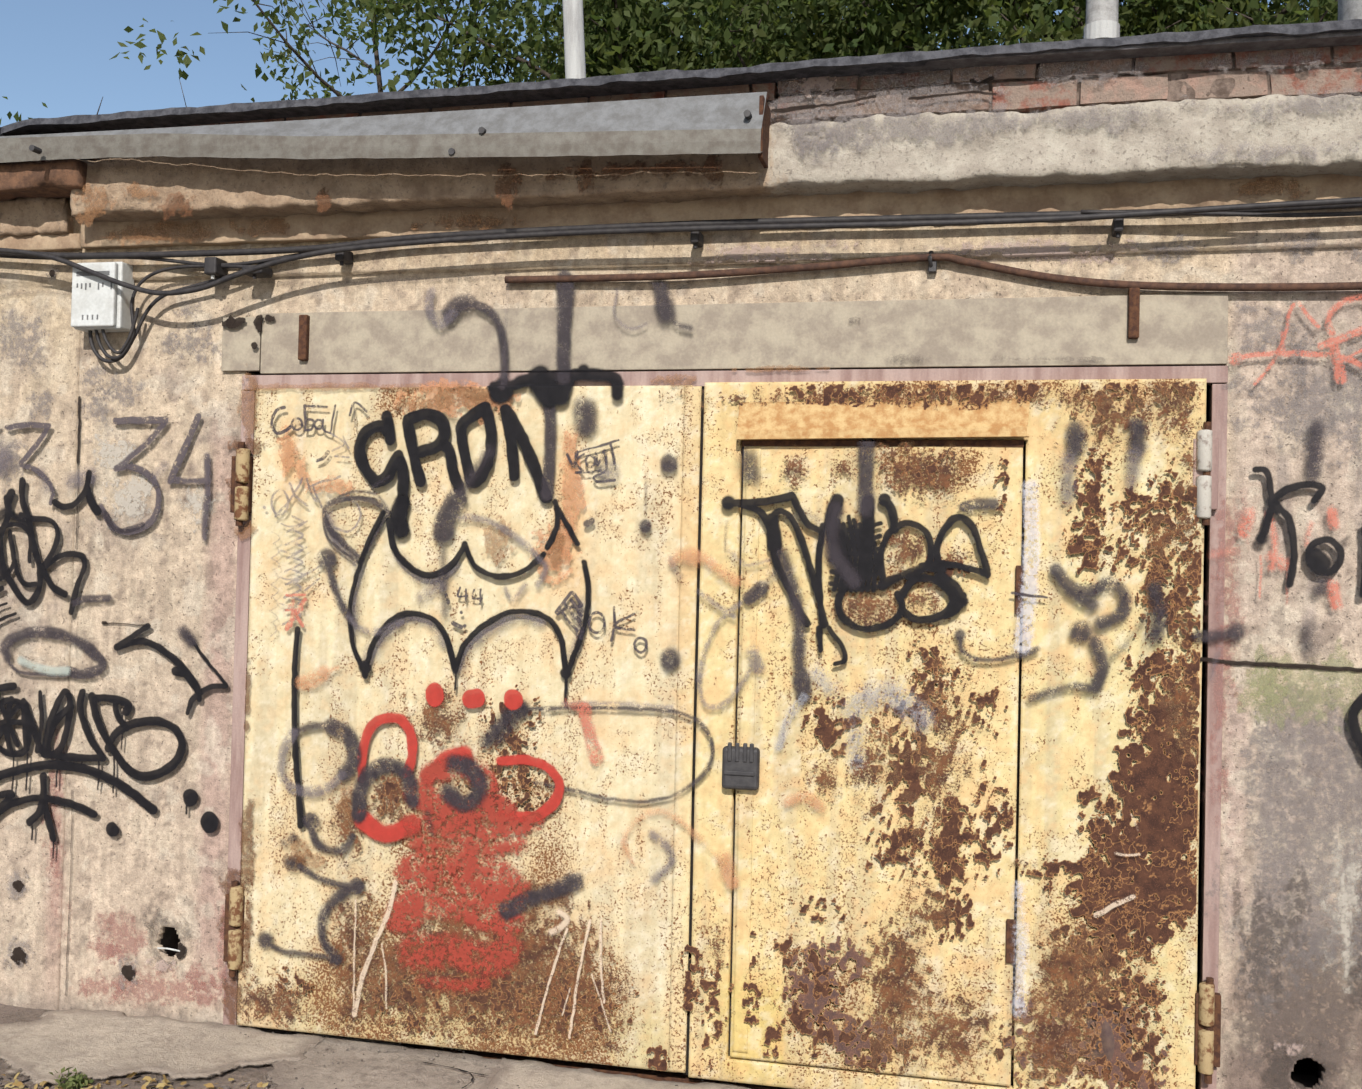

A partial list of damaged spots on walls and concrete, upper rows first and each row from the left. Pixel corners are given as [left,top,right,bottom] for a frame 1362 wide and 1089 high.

corrosion [217,678,670,1071]
corrosion [658,382,1203,1089]
water stain [1321,843,1361,991]